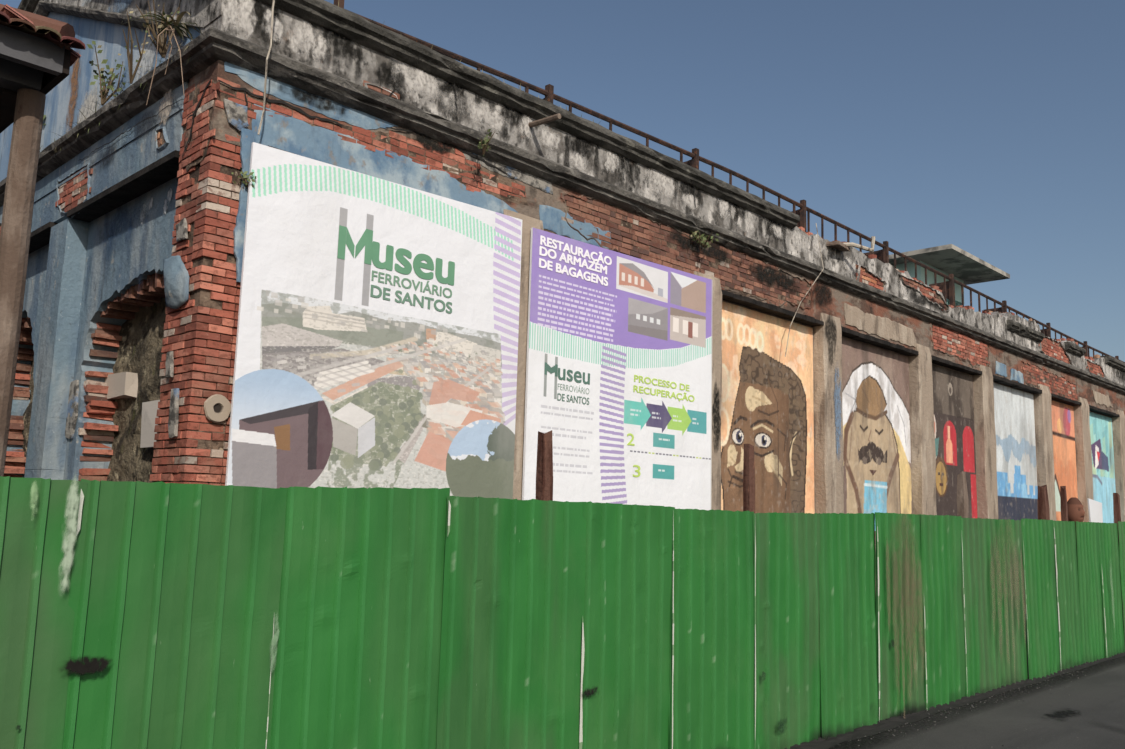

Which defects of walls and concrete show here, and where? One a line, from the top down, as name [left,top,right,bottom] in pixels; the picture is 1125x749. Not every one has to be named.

damp [222,0,361,77]
damp [292,88,345,114]
damp [379,61,702,209]
flaking render [55,163,93,218]
flaking render [140,62,814,486]
damp [673,231,728,262]
damp [719,201,825,256]
flaking render [855,254,886,292]
flaking render [896,269,1015,317]
flaking render [844,303,916,347]
flaking render [930,323,1078,401]
flaking render [1092,390,1113,407]